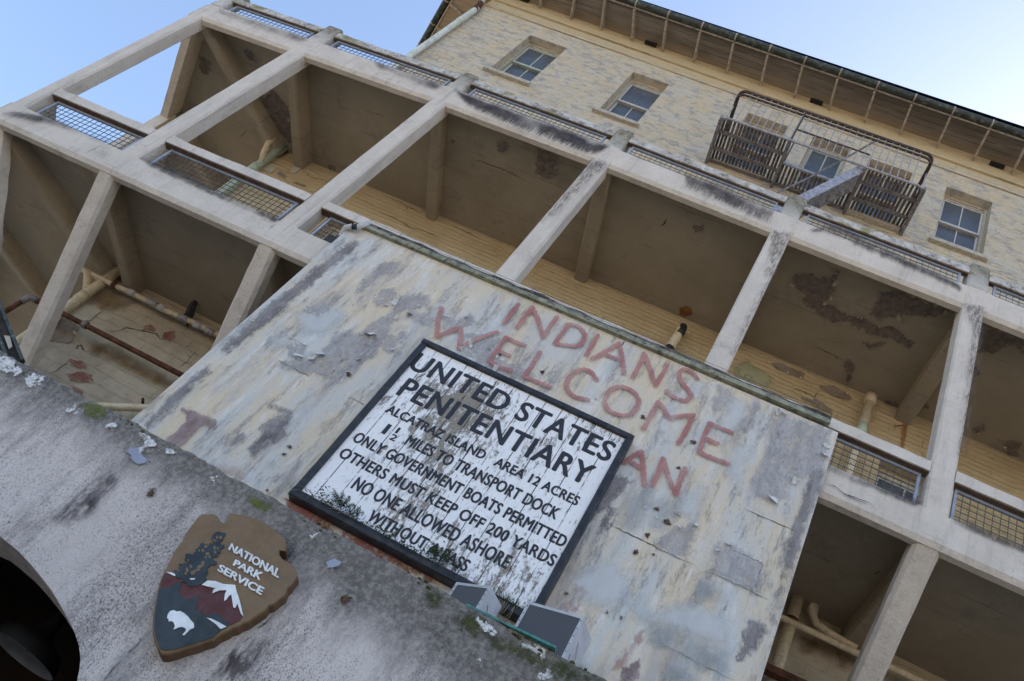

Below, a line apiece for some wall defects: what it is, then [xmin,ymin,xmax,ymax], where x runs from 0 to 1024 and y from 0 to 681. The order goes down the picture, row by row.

water stain [456,90,608,213]
water stain [685,174,770,218]
peeling [281,262,545,387]
peeling [789,271,949,351]
peeling [972,327,1024,379]